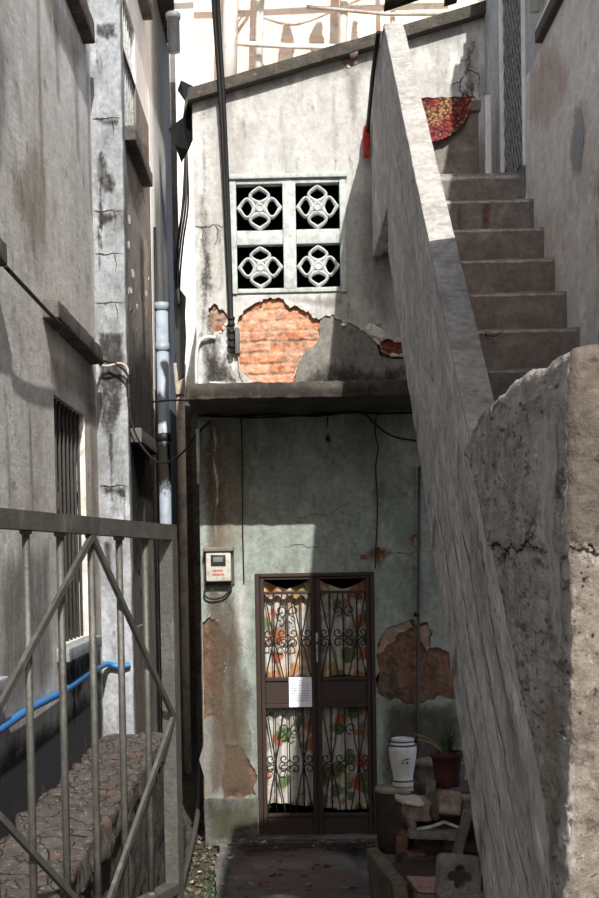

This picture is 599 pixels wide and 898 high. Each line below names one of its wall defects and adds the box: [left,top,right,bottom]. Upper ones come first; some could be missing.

crack [450,42,480,100]
leakage [99,238,153,462]
flaking render [208,296,407,383]
leakage [104,444,155,523]
flaking render [199,617,257,799]
flaking render [376,619,456,705]
crack [398,459,599,895]